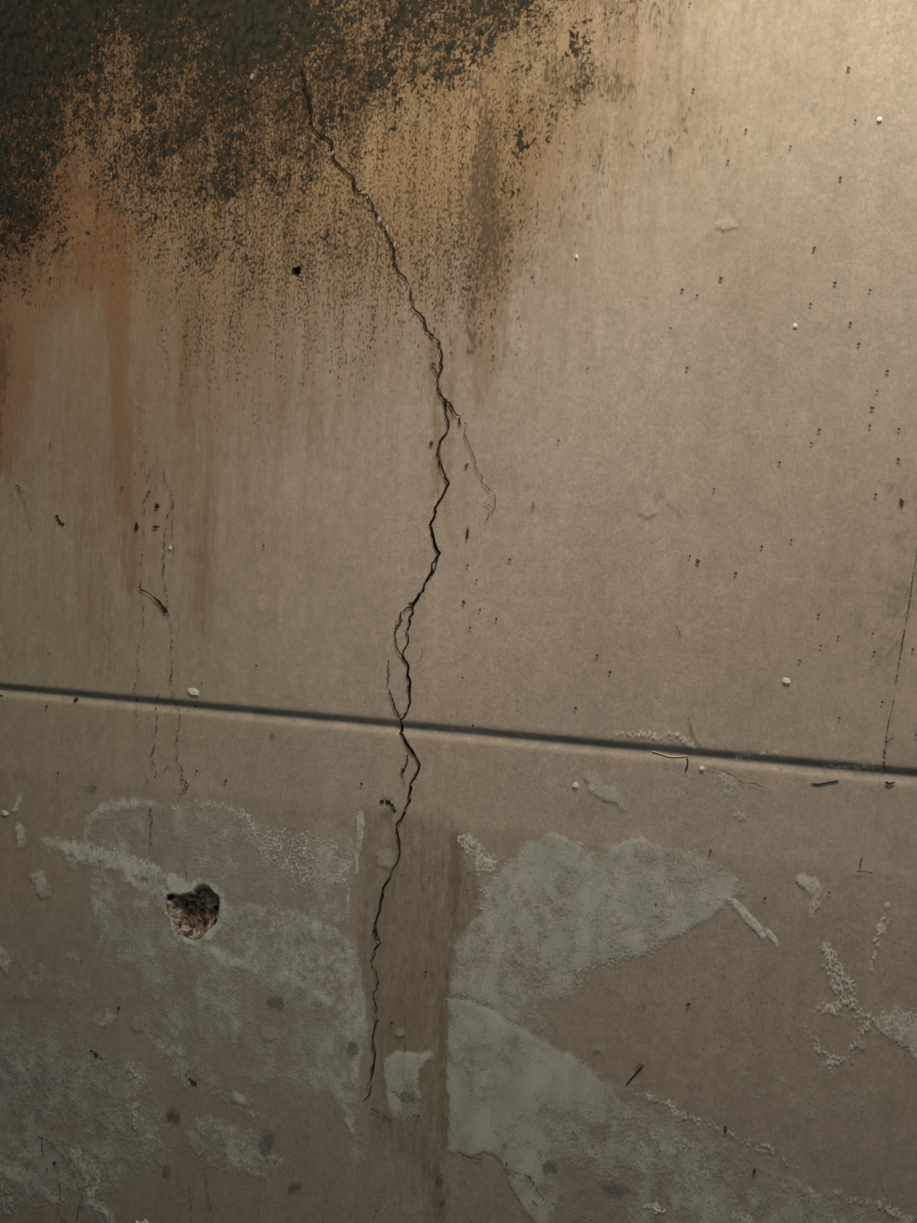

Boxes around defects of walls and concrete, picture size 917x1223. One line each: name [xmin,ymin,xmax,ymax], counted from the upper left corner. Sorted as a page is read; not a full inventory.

leakage [0,0,670,394]
crack [301,20,496,1122]
spalling [46,836,366,1167]